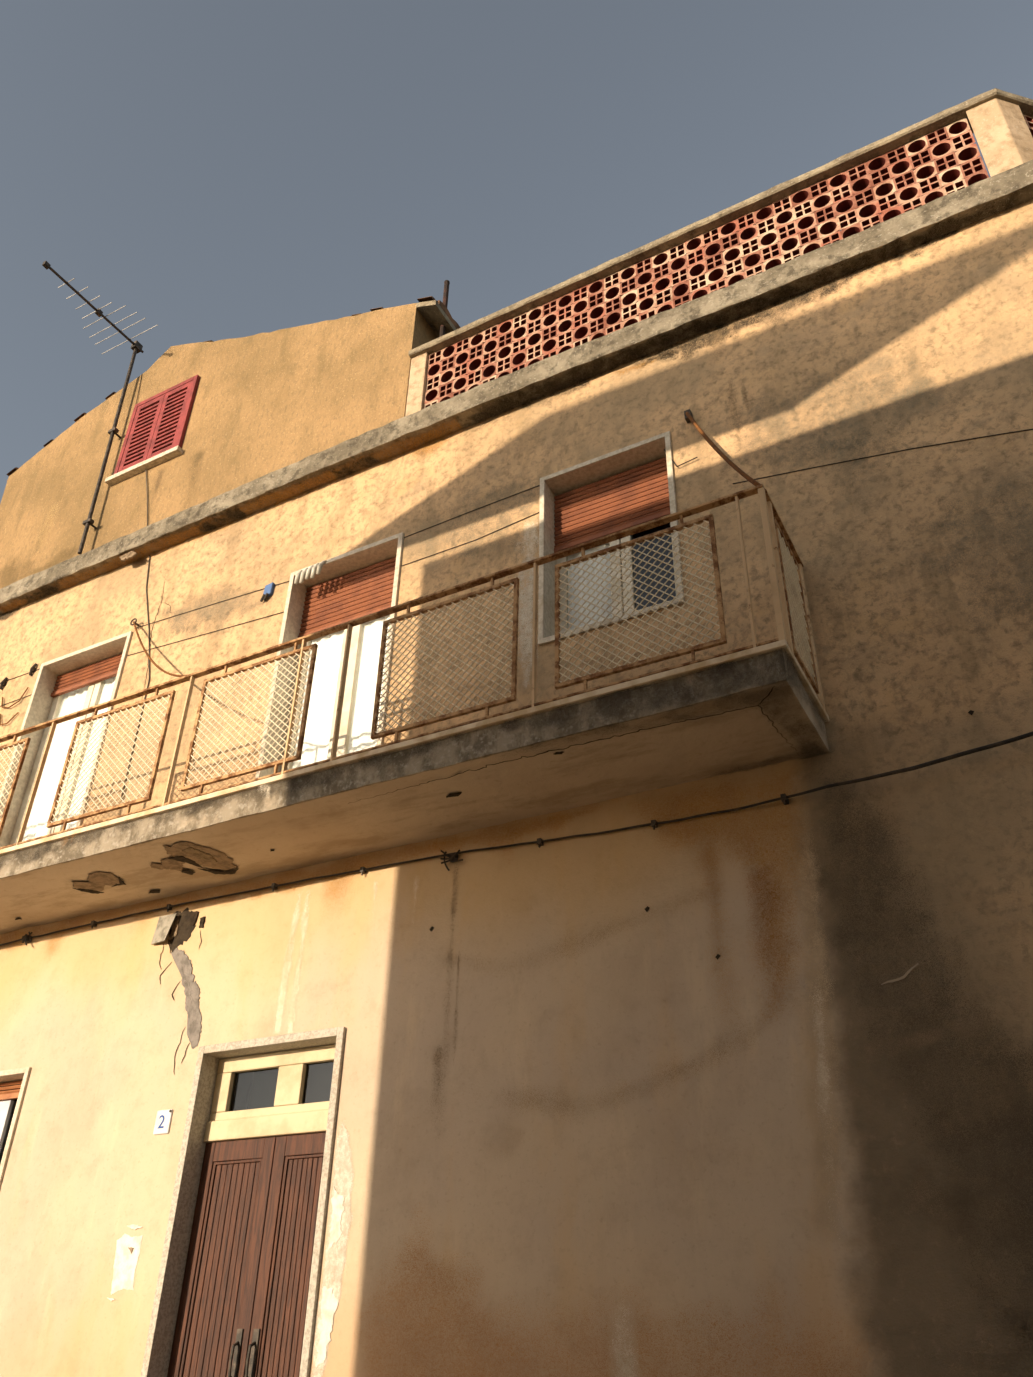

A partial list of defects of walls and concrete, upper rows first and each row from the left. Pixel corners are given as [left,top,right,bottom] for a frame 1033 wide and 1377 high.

spalling [72,872,126,894]
spalling [150,842,239,875]
spalling [151,907,206,968]
leakage [0,643,846,1247]